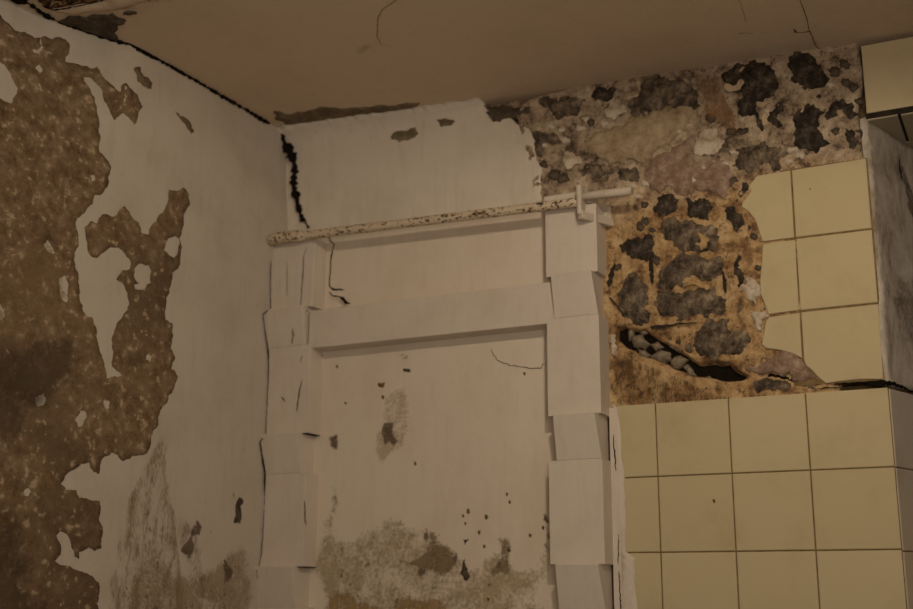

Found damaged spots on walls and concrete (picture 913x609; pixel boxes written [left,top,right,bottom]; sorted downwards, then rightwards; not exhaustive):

spalling [56,0,159,41]
crack [10,0,310,229]
peeling [273,103,419,125]
leakage [899,158,913,216]
spalling [484,43,864,409]
crack [329,237,350,304]
peeling [0,15,190,609]
crack [256,251,308,572]
crack [817,380,913,393]
leakage [113,492,249,609]
leakage [380,521,457,588]
leakage [316,536,538,609]